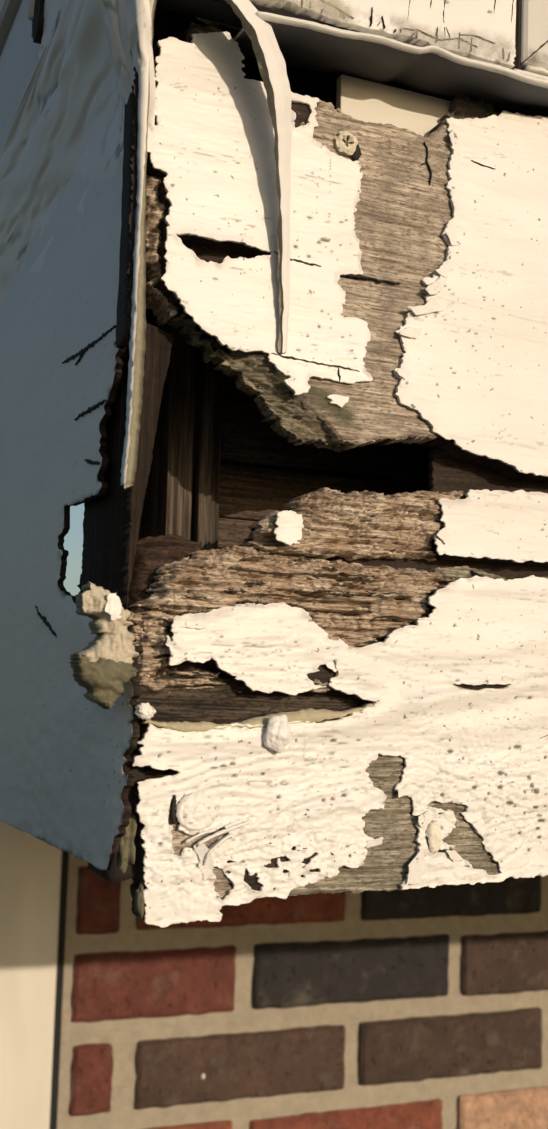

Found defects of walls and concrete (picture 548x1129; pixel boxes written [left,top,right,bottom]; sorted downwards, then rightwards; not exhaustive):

crack [275,0,514,62]
peeling [291,101,459,450]
peeling [239,487,466,562]
peeling [307,660,338,692]
peeling [168,809,250,900]
peeling [288,754,500,896]